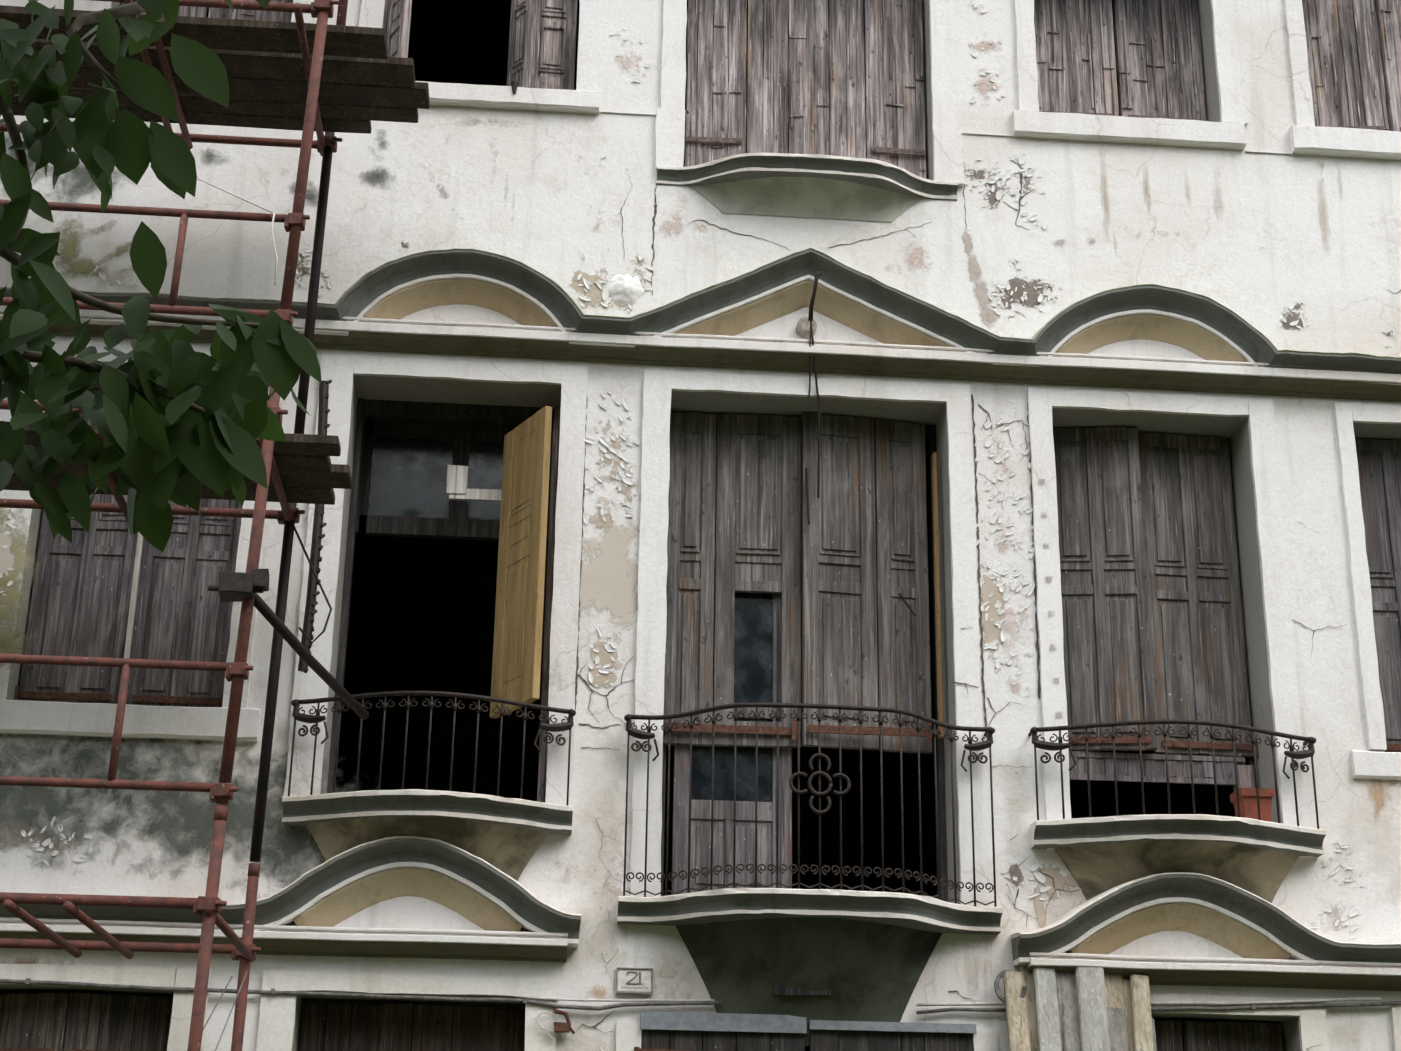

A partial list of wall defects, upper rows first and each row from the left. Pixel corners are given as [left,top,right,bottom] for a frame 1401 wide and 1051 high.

peeling [963,153,1048,230]
crack [1004,156,1034,230]
crack [620,172,657,295]
crack [689,219,793,251]
crack [829,222,930,248]
crack [962,147,996,325]
leakage [0,287,12,324]
spalling [569,246,654,313]
leakage [45,247,1401,402]
spalling [989,259,1062,316]
spalling [1280,300,1310,330]
peeling [579,390,641,687]